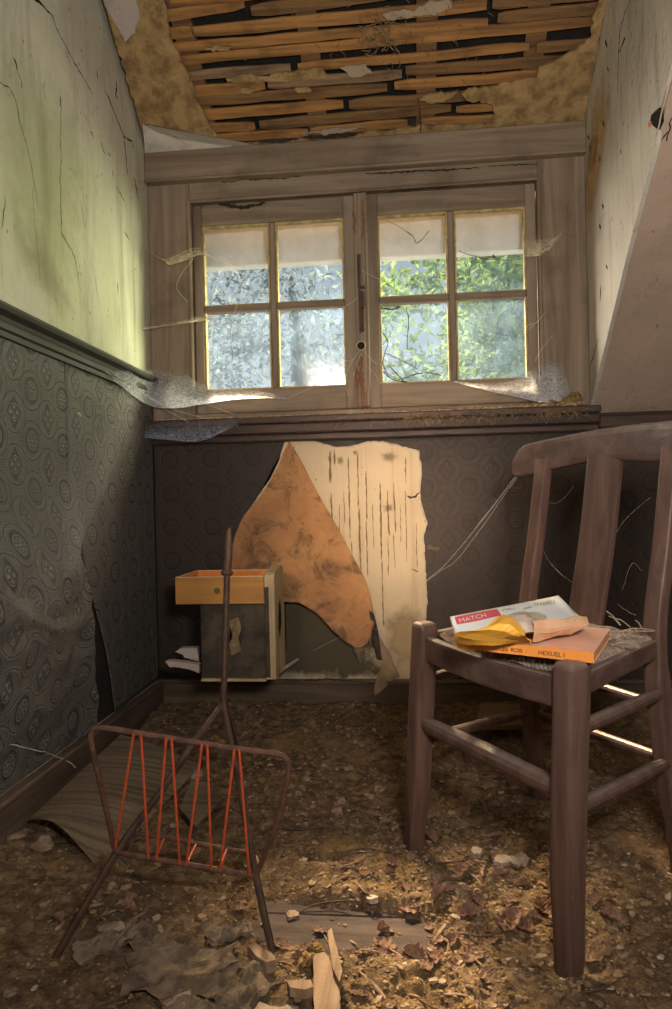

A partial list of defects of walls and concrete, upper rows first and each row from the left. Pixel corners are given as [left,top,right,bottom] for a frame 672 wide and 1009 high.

crack [0,58,118,304]
crack [35,0,138,201]
spalling [102,0,607,153]